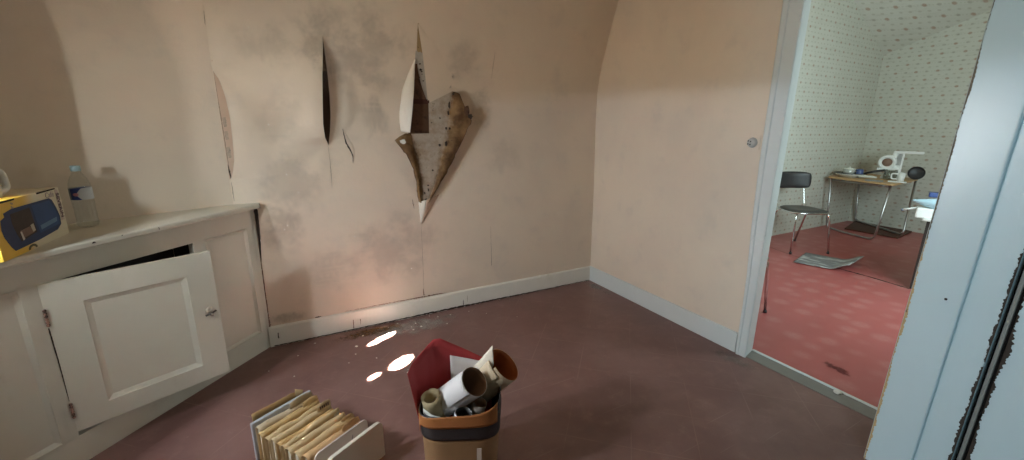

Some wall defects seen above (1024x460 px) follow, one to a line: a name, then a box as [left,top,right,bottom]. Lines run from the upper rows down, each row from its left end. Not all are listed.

crack [213,71,588,346]